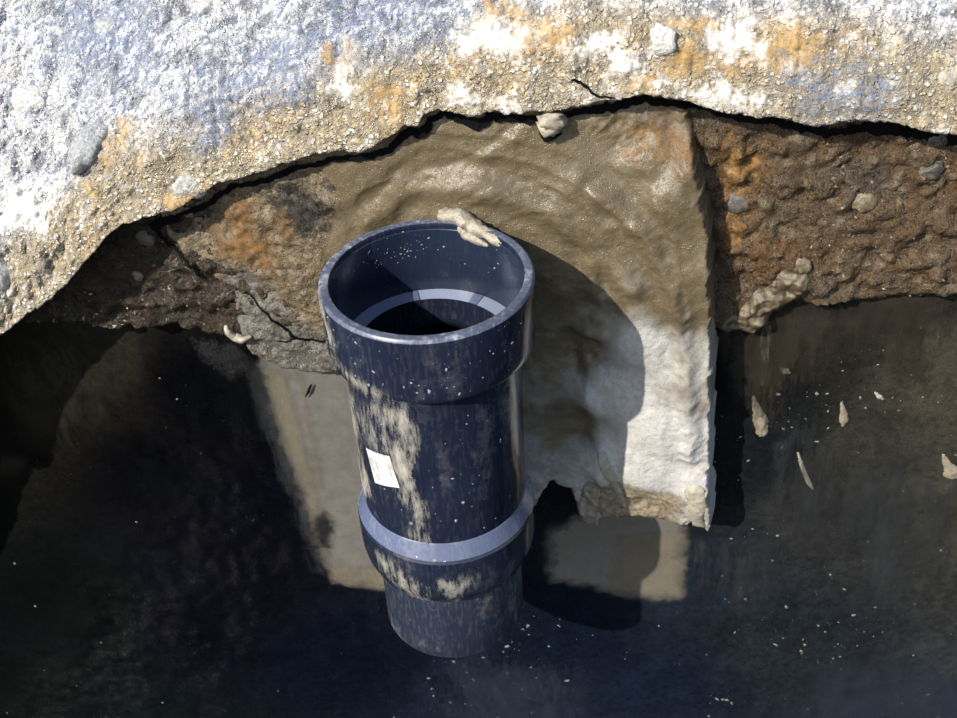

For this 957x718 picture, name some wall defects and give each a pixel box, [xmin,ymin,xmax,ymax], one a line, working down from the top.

corrosion [666,40,714,74]
corrosion [721,23,819,74]
spalling [536,110,568,138]
spalling [640,109,700,170]
spalling [265,182,334,238]
crack [147,78,957,282]
corrosion [715,135,764,248]
peeling [224,325,252,344]
crack [245,292,326,360]
peeling [256,358,384,588]
peeling [549,483,685,598]